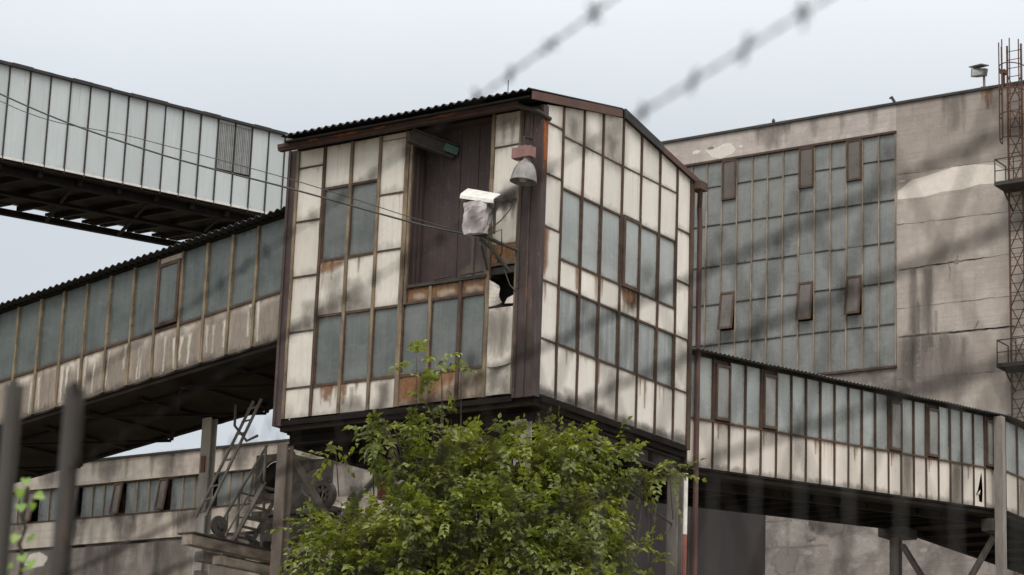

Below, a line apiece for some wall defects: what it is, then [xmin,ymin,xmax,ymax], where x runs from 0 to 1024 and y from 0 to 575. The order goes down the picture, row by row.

peeling [692,143,743,159]
peeling [897,164,1008,200]
water stain [22,299,280,414]
rust [321,382,357,403]